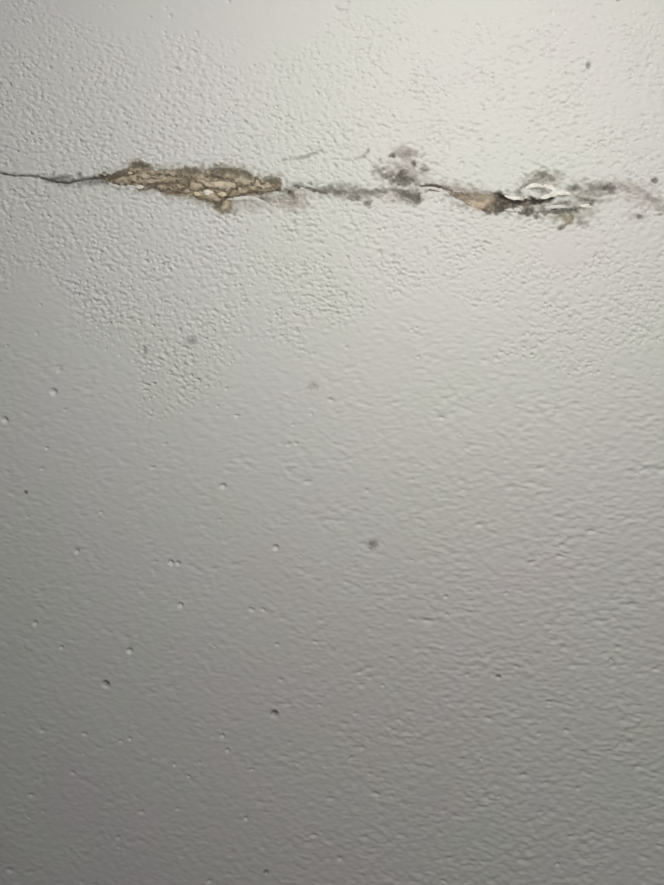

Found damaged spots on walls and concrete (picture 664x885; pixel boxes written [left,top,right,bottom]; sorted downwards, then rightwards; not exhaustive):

crack [2,173,103,184]
peeling [99,161,282,214]
crack [420,184,470,200]
flaking render [455,177,593,229]